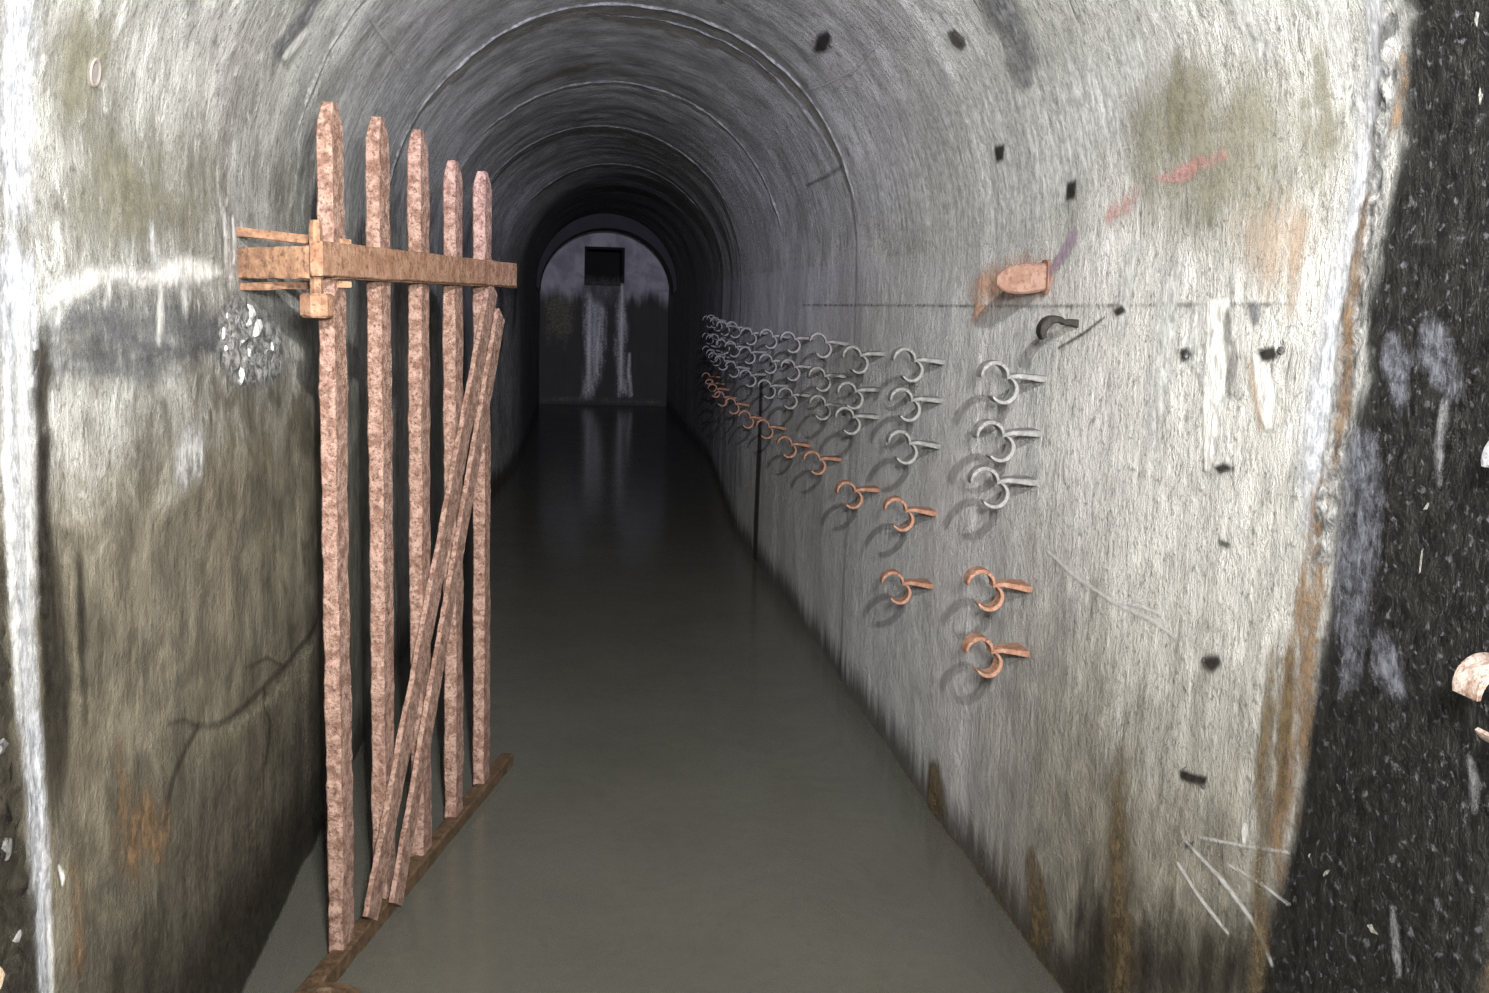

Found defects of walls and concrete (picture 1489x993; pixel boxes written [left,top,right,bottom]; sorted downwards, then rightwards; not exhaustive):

leakage [0,0,34,218]
leakage [863,32,1274,262]
spalling [217,296,283,385]
leakage [0,151,236,993]
leakage [1071,0,1489,993]
leakage [143,770,327,993]
crack [168,618,317,798]
leakage [928,762,958,846]
leakage [1019,850,1054,980]
corrosion [1250,494,1325,993]